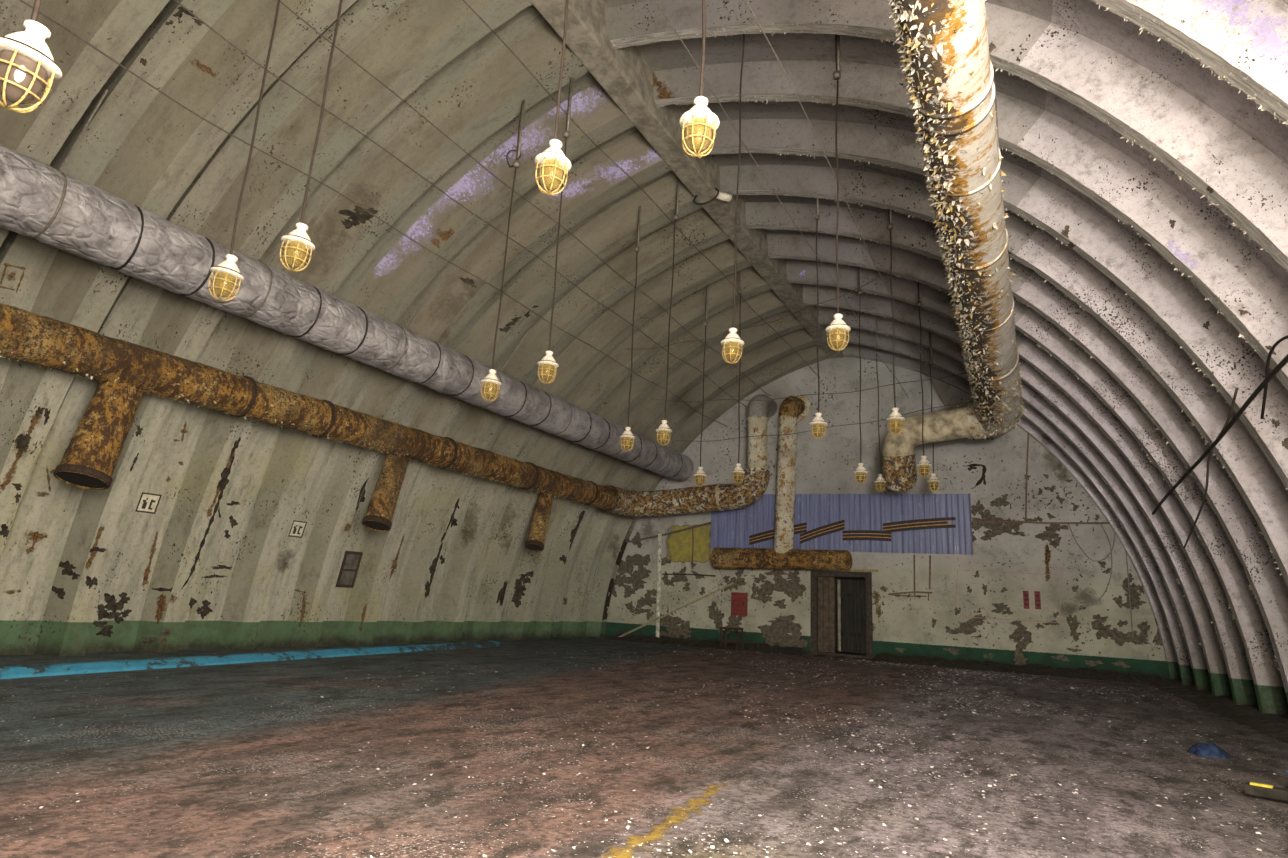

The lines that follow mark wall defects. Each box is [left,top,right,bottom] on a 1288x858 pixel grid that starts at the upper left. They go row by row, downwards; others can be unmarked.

rust [0,406,45,490]
rust [207,436,241,516]
peeling [141,389,808,648]
peeling [52,560,132,637]